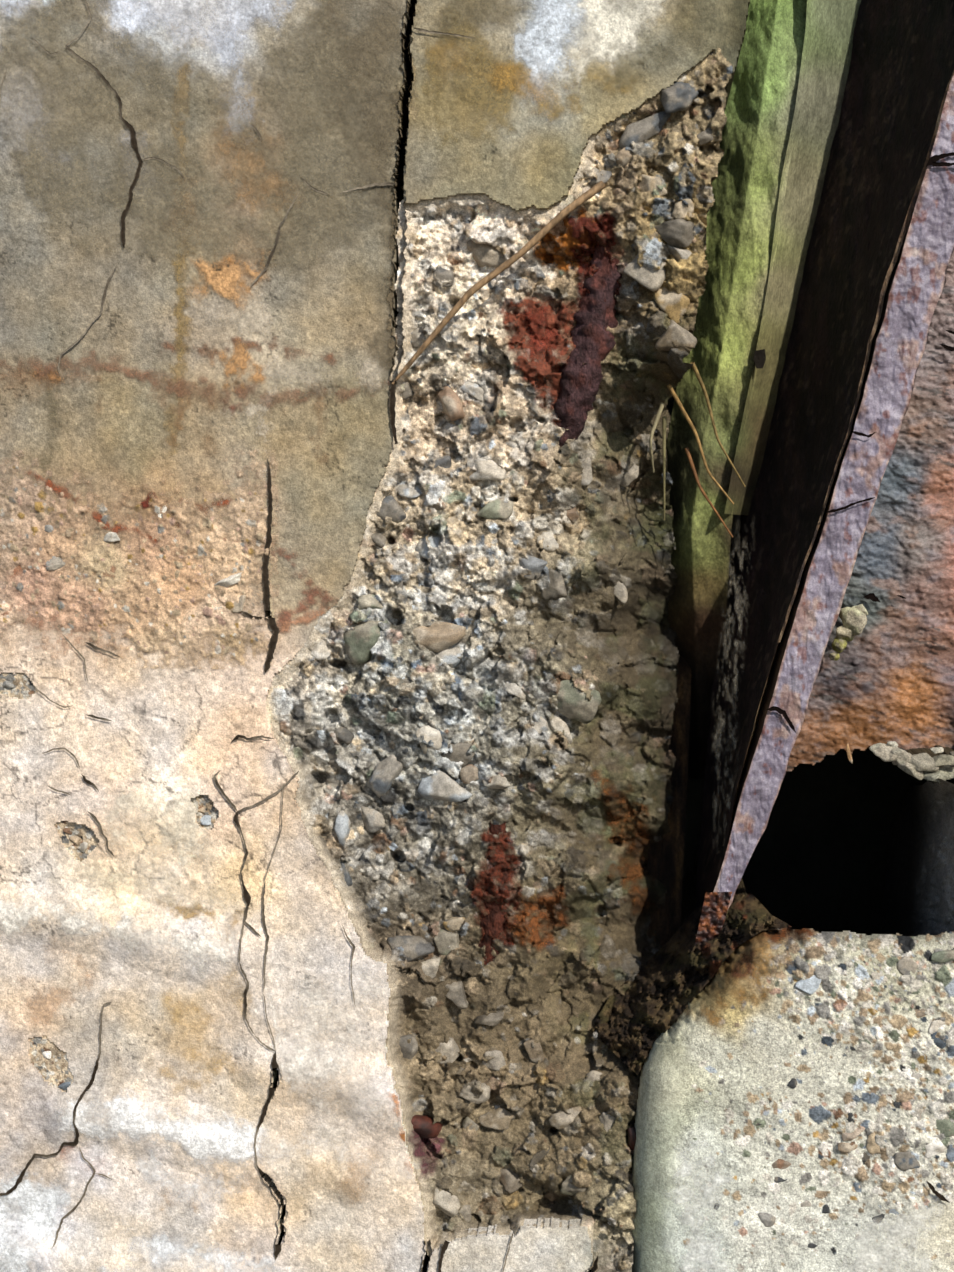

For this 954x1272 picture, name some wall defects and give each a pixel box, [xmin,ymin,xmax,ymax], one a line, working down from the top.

leakage [0,0,402,386]
crack [251,0,474,444]
rust [500,208,621,425]
rust [778,71,954,642]
spalling [0,450,279,669]
crack [242,459,280,673]
spalling [263,0,750,1272]
spalling [54,821,99,862]
spalling [191,795,219,830]
crack [214,735,299,1261]
rust [468,829,568,949]
crack [0,1002,112,1248]